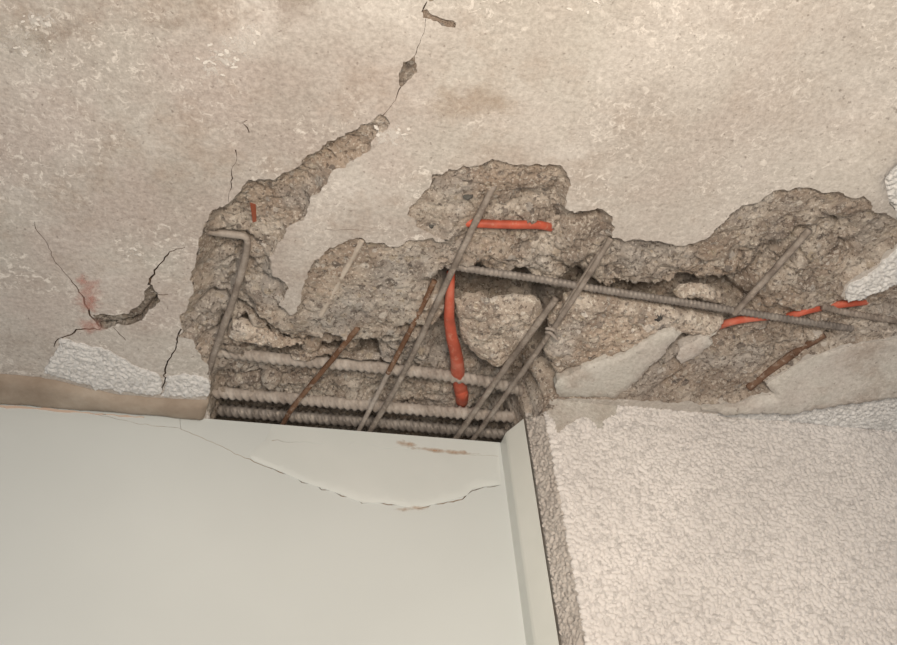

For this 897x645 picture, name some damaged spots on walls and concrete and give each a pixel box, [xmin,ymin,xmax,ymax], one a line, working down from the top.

peeling [196,43,240,76]
crack [383,0,456,117]
crack [35,227,126,345]
crack [148,247,185,295]
spalling [44,114,897,443]
crack [162,329,182,389]